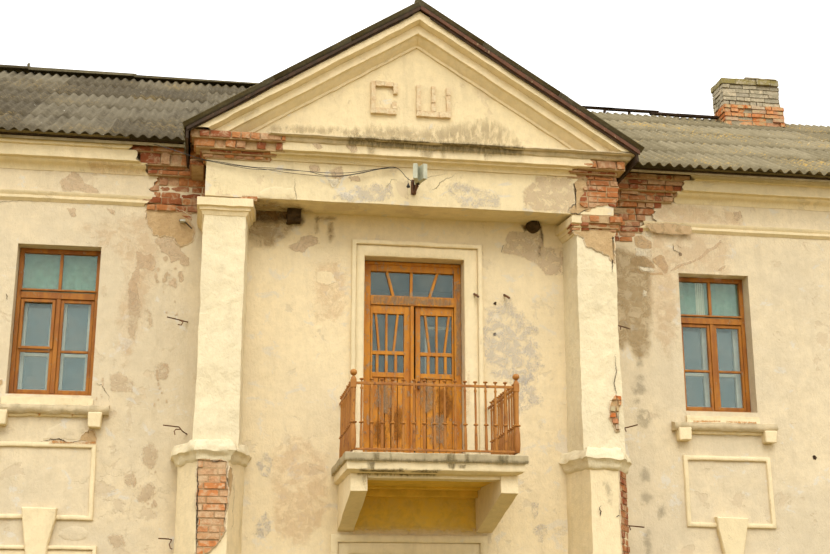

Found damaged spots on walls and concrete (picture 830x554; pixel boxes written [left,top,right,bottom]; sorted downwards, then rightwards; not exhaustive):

leakage [349,136,523,155]
spalling [128,129,286,336]
spalling [524,160,721,275]
flaking render [79,429,97,443]
flaking render [608,394,622,433]
peeling [125,475,157,507]
flaking render [194,459,233,554]
flaking render [619,470,630,554]